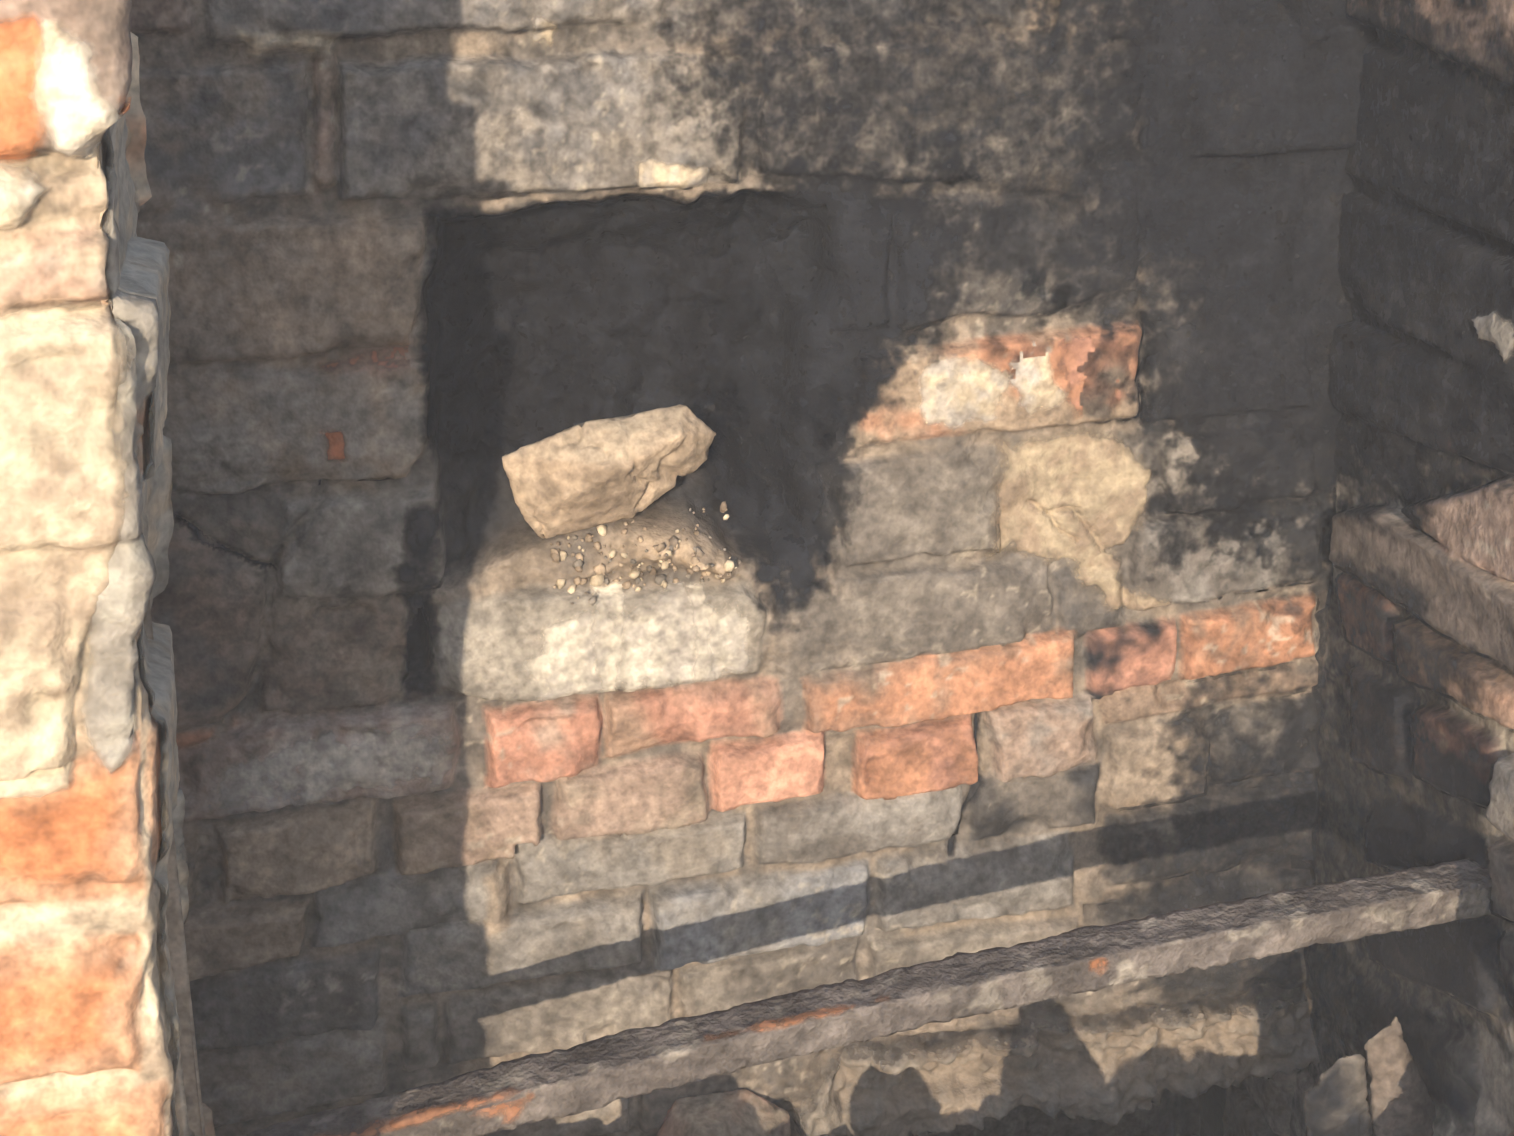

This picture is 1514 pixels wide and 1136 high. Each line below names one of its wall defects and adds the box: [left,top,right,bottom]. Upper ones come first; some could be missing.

crack [176,515,275,568]